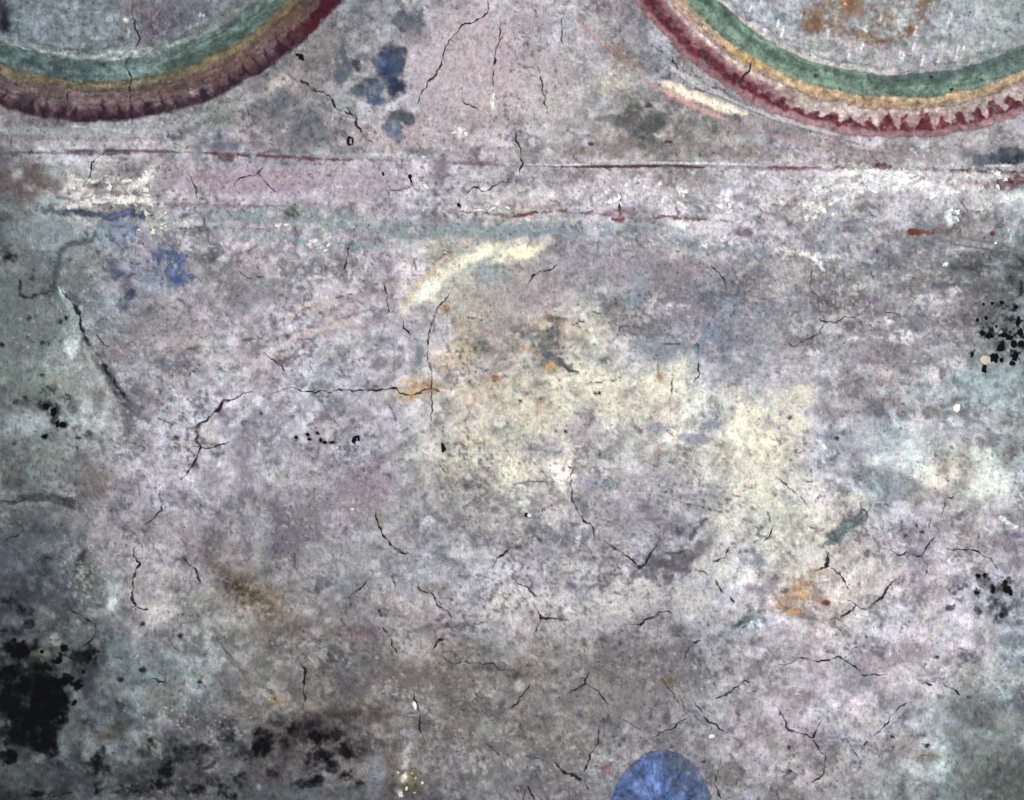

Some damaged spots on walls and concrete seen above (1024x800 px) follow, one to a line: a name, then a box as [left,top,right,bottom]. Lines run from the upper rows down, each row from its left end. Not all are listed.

crack [418,8,501,103]
crack [62,291,126,399]
crack [266,285,450,421]
damp [970,281,1024,373]
crack [180,391,251,480]
crack [493,546,556,632]
crack [568,466,656,569]
crack [820,493,998,620]
damp [946,573,1017,623]
damp [0,598,100,765]
damp [86,711,364,800]
crack [779,709,826,782]